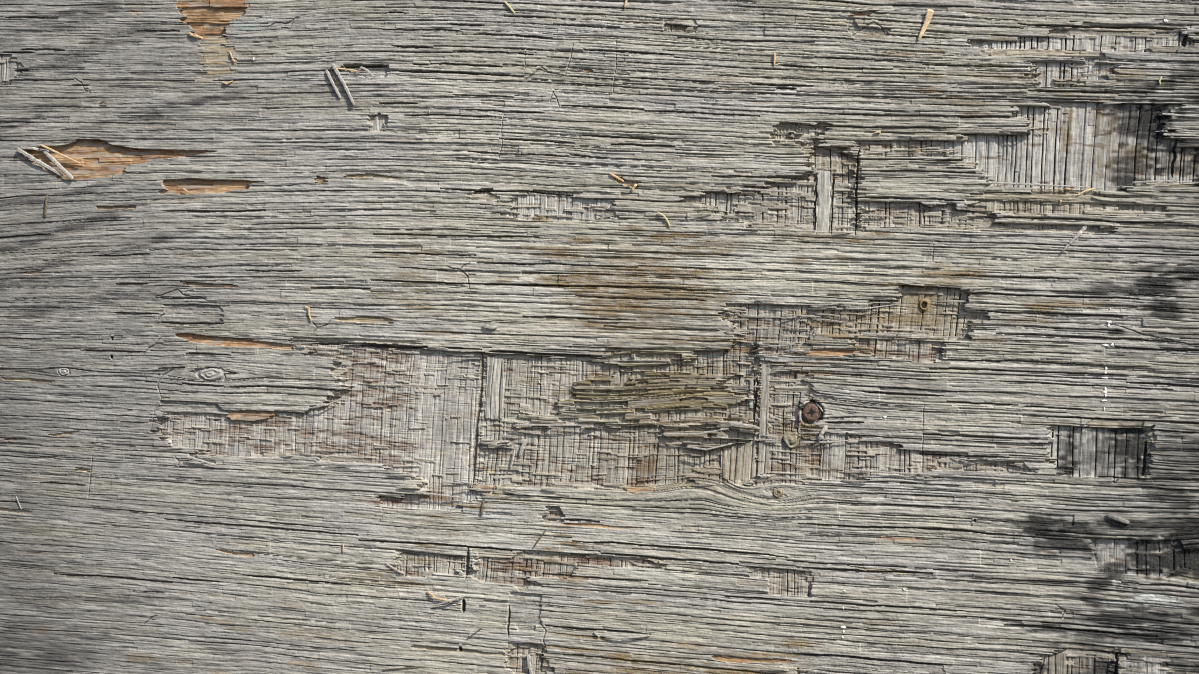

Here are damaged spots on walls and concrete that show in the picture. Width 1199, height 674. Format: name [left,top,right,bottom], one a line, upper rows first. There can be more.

peeling [968,30,1199,87]
leakage [1100,72,1199,186]
peeling [678,102,1199,234]
leakage [1078,264,1199,319]
peeling [153,280,1038,511]
peeling [1045,425,1156,483]
leakage [1056,425,1162,487]
peeling [541,506,565,524]
leakage [1024,515,1199,657]
peeling [1031,630,1173,674]
leakage [1094,661,1118,674]